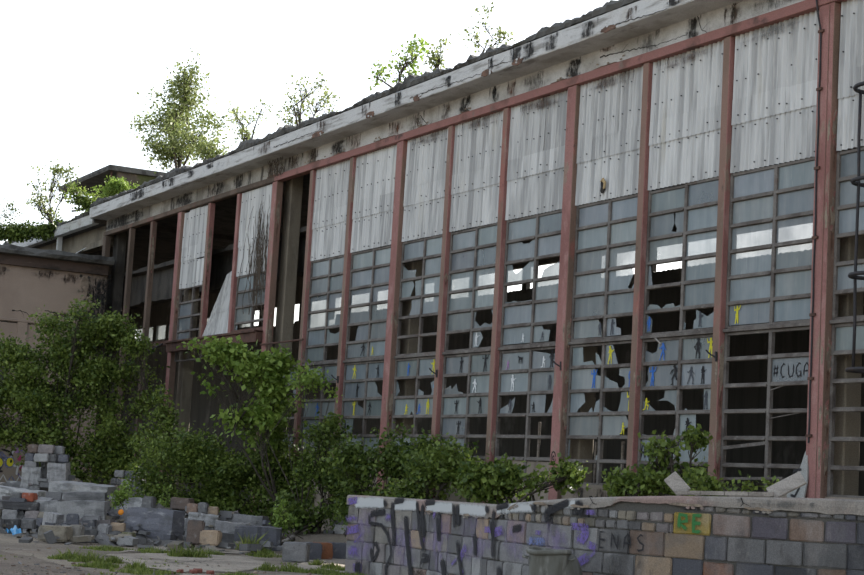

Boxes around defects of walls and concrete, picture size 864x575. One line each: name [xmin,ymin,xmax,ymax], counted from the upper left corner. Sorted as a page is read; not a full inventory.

crack [600,16,707,58]
leakage [686,17,701,38]
leakage [510,44,534,60]
leakage [567,57,581,77]
leakage [442,95,497,128]